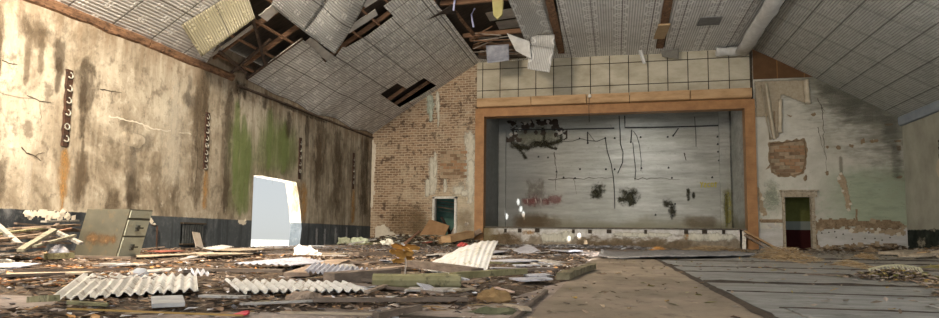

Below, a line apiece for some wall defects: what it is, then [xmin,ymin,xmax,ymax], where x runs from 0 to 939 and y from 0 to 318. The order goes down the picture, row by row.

water stain [22,16,46,85]
water stain [55,40,65,92]
rust [60,151,68,210]
water stain [73,61,93,203]
water stain [106,174,138,209]
crack [100,89,198,195]
water stain [191,71,210,205]
water stain [223,81,251,214]
peeling [755,79,816,181]
spalling [709,171,932,259]